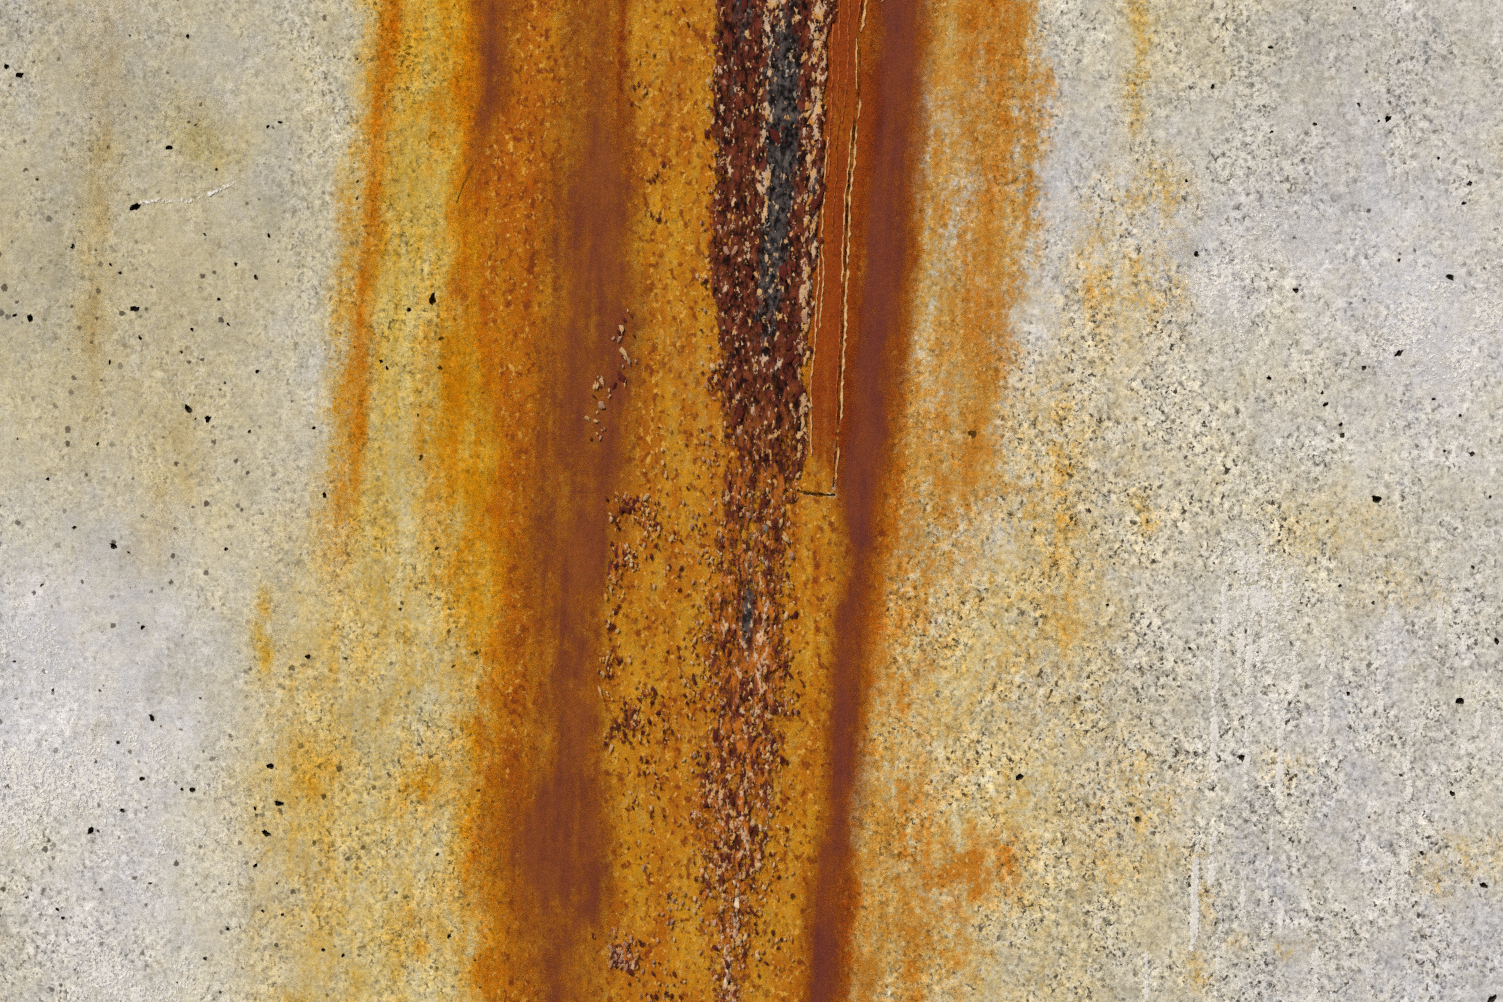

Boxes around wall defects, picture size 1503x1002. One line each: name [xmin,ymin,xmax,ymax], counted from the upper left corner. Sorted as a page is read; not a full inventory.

corrosion [443,0,1049,1002]